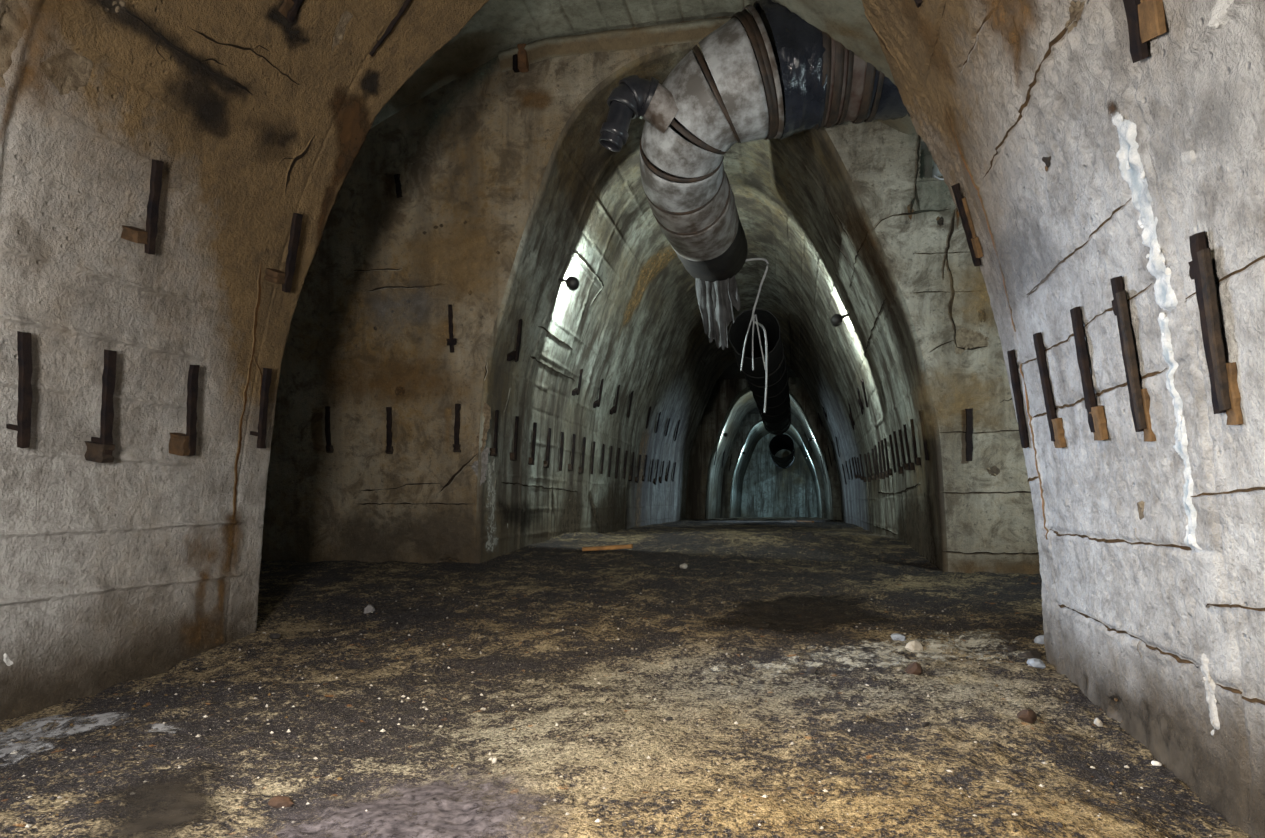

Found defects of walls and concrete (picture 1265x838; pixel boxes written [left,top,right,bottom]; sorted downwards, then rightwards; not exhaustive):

crack [140,18,301,95]
crack [832,0,1132,356]
crack [867,283,1195,555]
leakage [1111,109,1202,553]
leakage [0,687,128,765]
leakage [1201,653,1220,735]